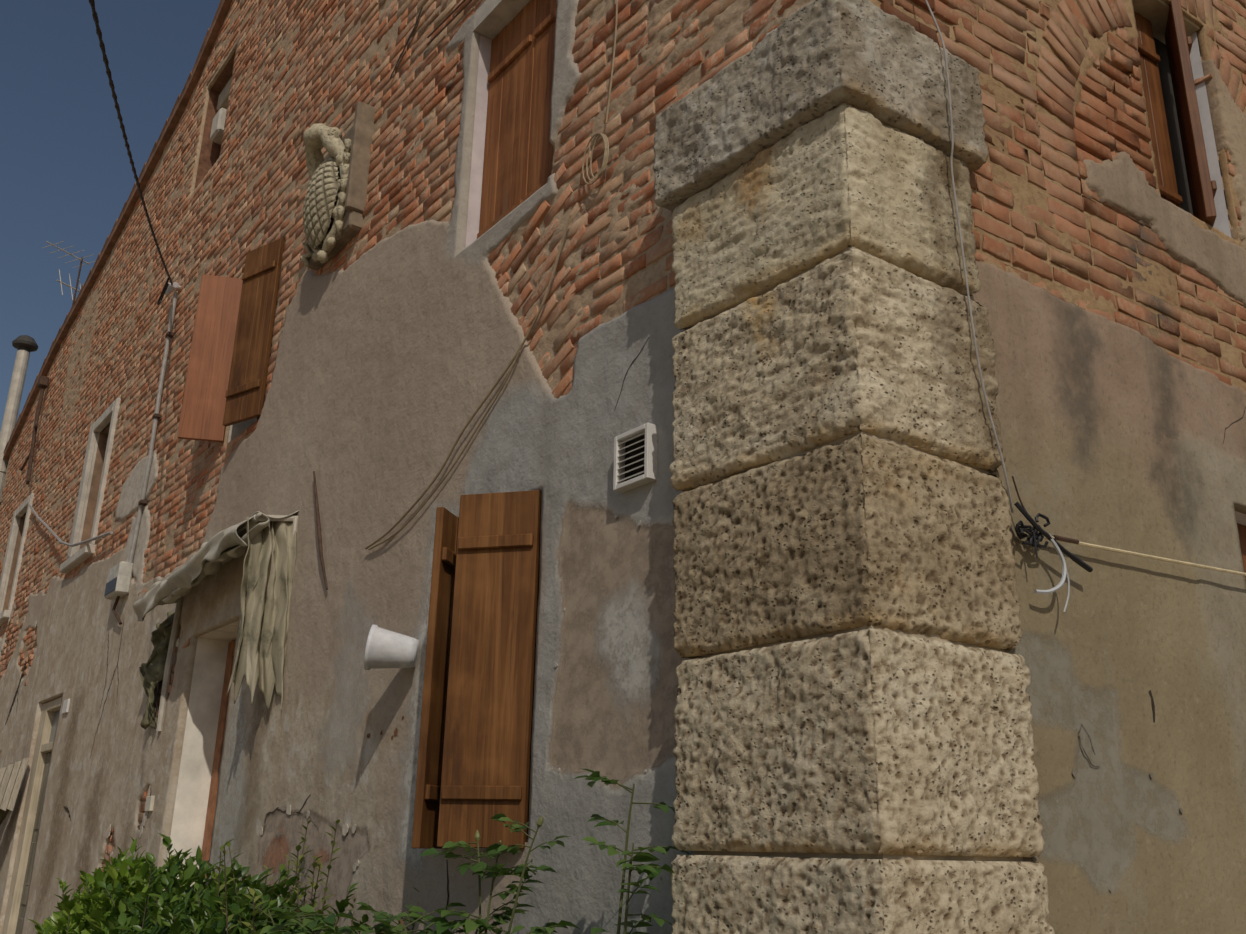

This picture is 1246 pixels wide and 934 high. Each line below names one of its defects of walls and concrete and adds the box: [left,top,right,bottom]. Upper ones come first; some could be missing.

flaking render [0,567,38,686]
peeling [549,502,691,788]
peeling [256,805,369,933]